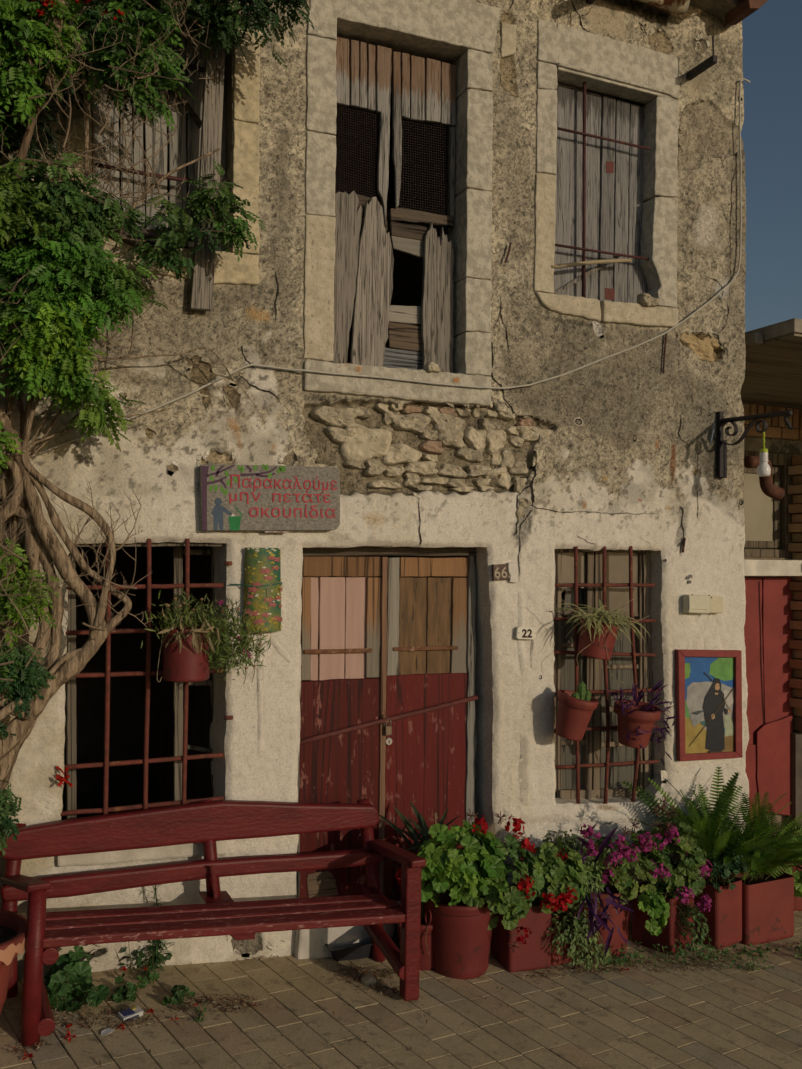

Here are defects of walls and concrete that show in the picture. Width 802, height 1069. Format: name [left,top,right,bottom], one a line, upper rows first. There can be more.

crack [491,297,700,574]
flaking render [675,330,724,362]